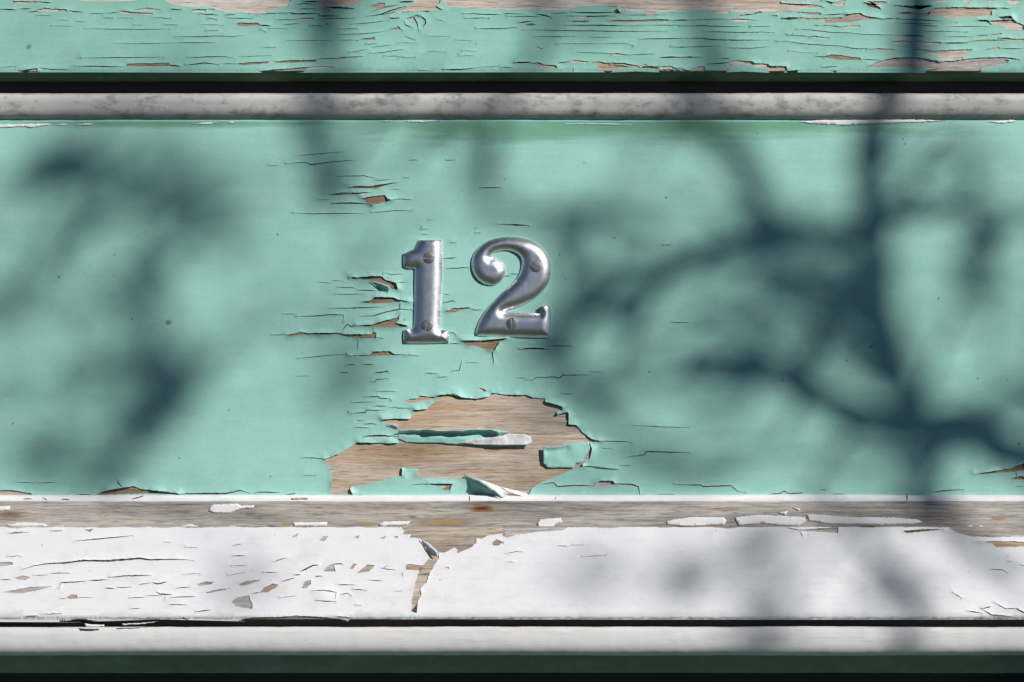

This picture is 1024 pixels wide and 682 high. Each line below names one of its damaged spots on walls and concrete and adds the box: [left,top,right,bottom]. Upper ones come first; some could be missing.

peeling [12,0,360,26]
peeling [372,0,1024,71]
peeling [226,60,333,71]
crack [269,152,427,235]
crack [296,280,412,329]
peeling [324,388,640,497]
peeling [0,490,32,511]
peeling [667,508,1024,547]
peeling [0,562,52,593]
peeling [323,563,375,574]
peeling [379,518,570,613]
peeling [197,580,335,619]